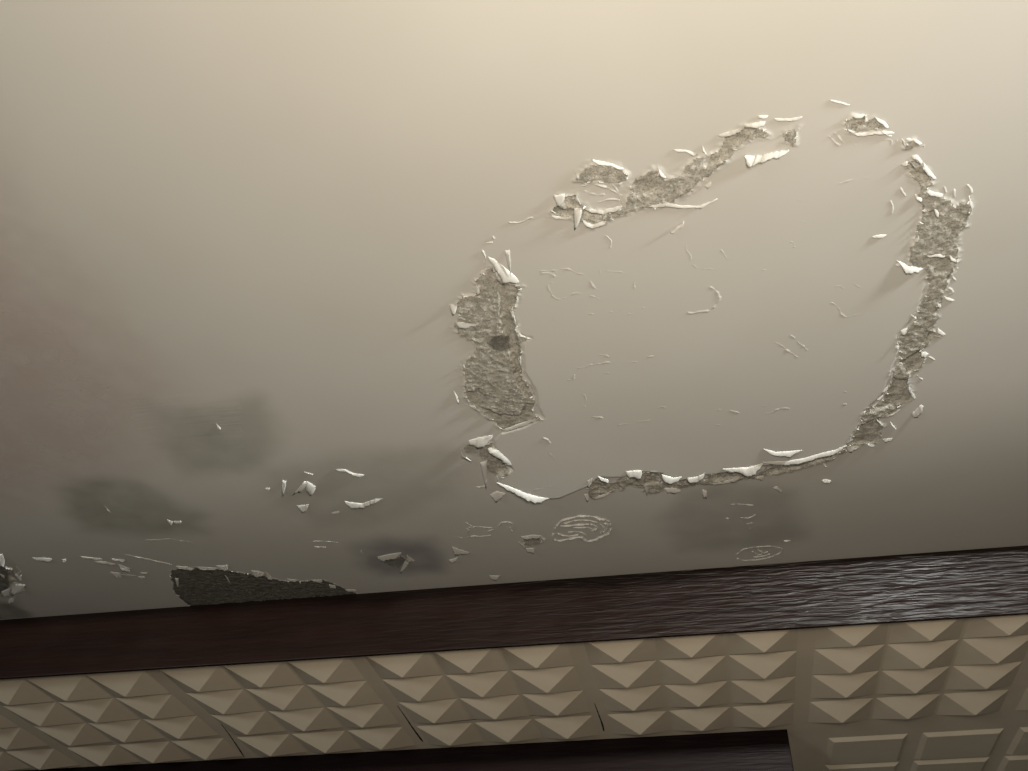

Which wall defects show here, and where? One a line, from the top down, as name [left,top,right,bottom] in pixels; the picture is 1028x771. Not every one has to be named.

peeling [538,115,810,234]
flaking render [581,100,980,502]
flaking render [445,250,549,504]
peeling [265,472,316,513]
peeling [332,499,382,515]
peeling [0,554,26,604]
flaking render [166,565,361,606]